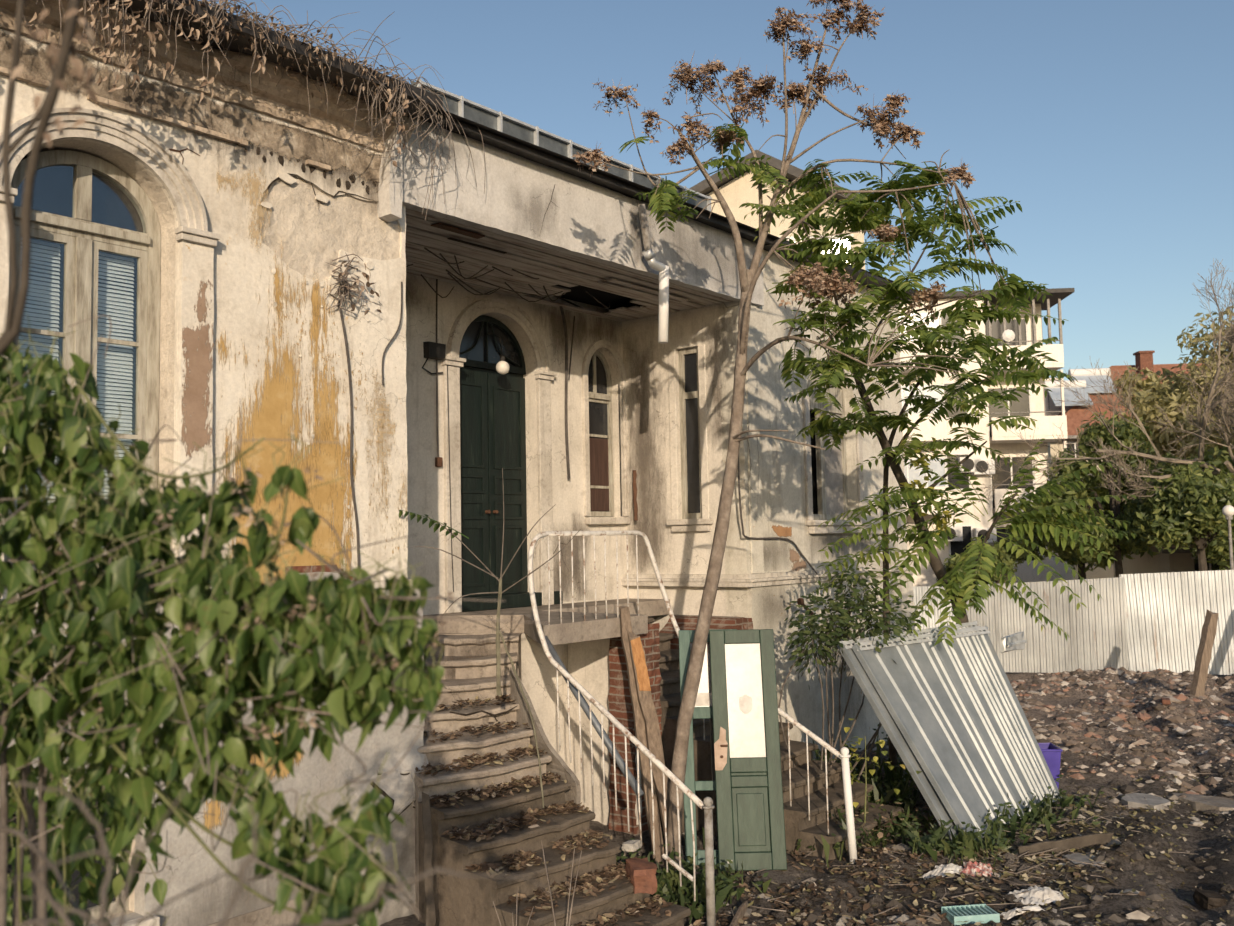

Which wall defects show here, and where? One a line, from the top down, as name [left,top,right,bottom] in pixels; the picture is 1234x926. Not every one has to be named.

flaking render [181,147,407,584]
flaking render [772,525,807,571]